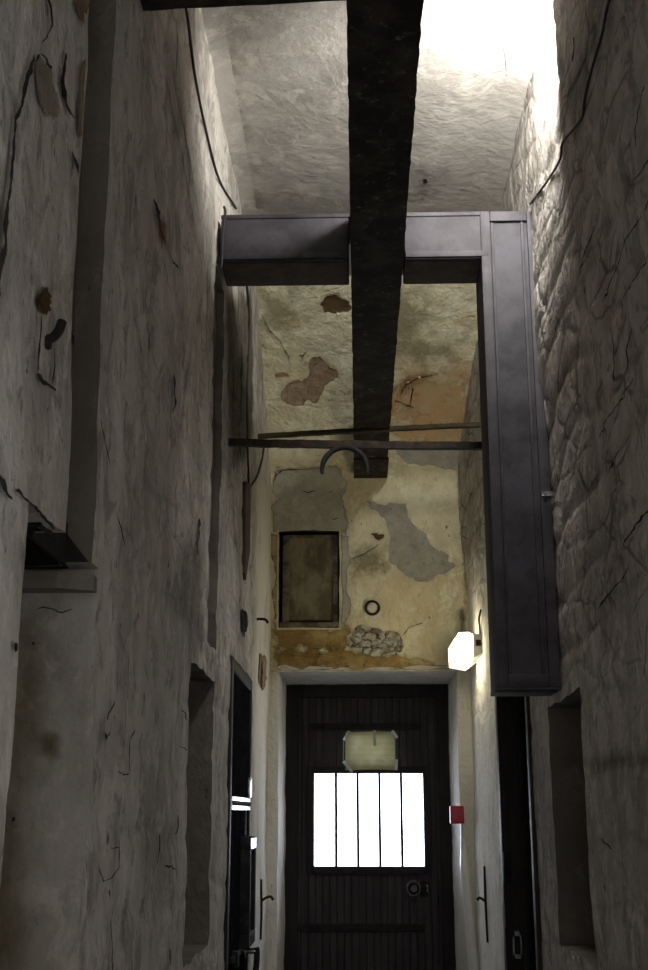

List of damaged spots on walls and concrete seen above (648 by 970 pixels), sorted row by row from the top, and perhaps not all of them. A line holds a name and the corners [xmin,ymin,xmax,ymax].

crack [0,0,75,296]
spalling [37,287,52,315]
spalling [320,295,352,315]
crack [37,316,56,391]
spalling [281,356,339,406]
crack [0,475,55,530]
peeling [258,466,455,690]
damp [272,623,434,671]